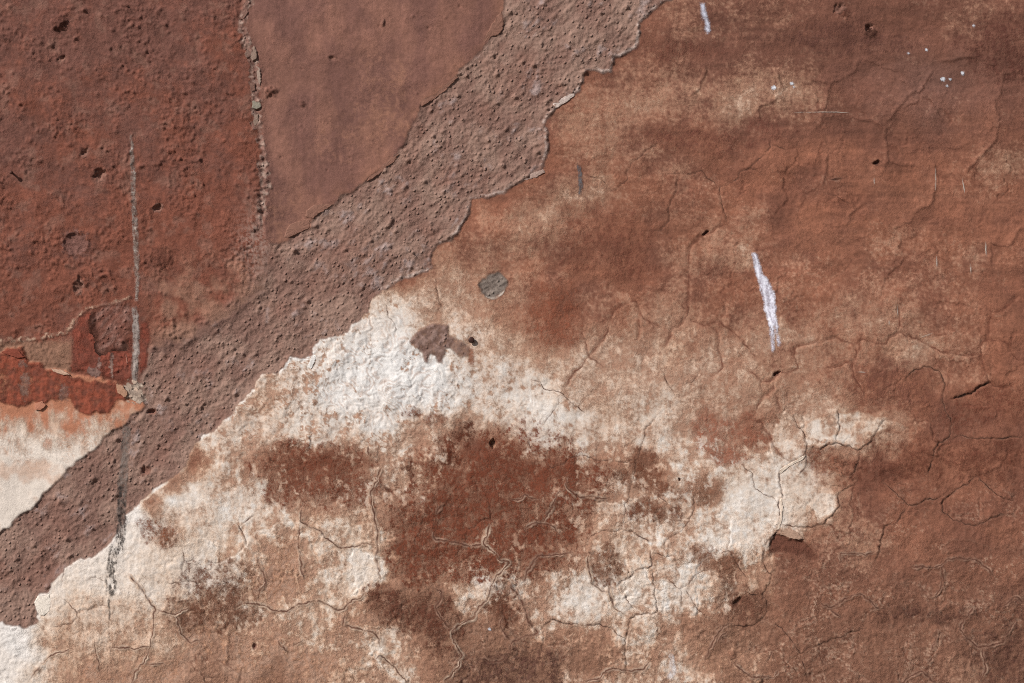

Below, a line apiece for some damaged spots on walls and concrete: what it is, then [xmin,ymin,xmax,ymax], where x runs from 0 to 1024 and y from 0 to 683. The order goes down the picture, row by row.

crack [660,143,782,279]
crack [93,574,197,681]
crack [246,446,406,680]
spalling [0,0,666,628]
water stain [0,247,1024,683]
crack [433,425,701,682]
crack [541,313,613,413]
crack [723,412,878,666]
crack [839,479,1002,561]
crack [836,311,1010,468]
crack [959,595,1021,674]